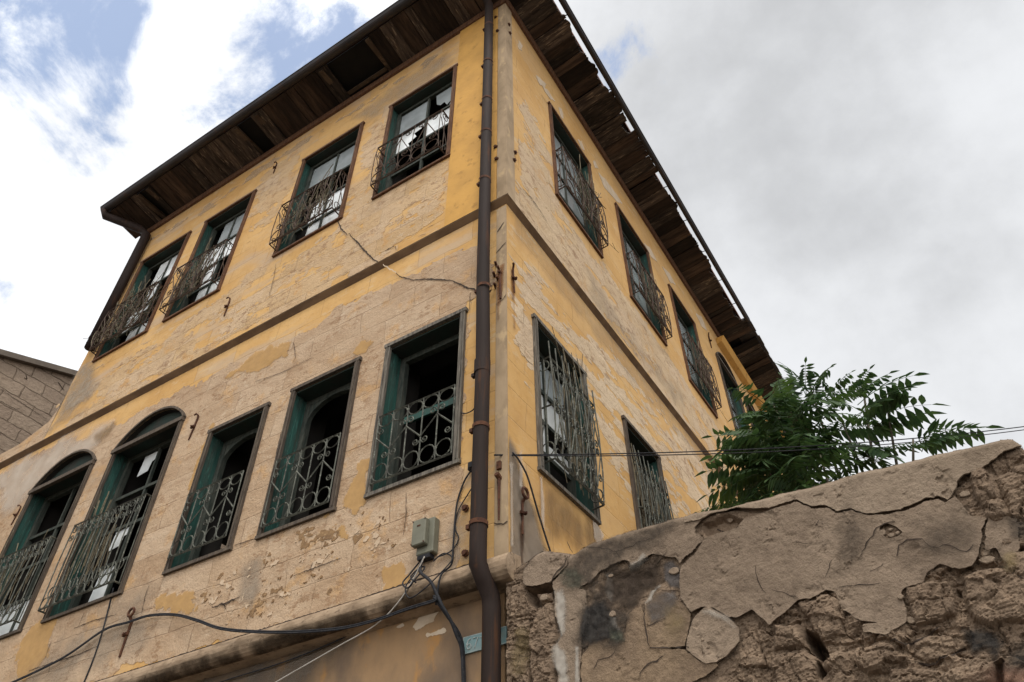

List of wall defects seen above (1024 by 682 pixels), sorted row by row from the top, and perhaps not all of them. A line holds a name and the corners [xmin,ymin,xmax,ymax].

crack [337,221,475,308]
peeling [0,115,477,682]
spalling [510,585,563,682]
spalling [587,557,680,634]
spalling [702,451,1024,682]